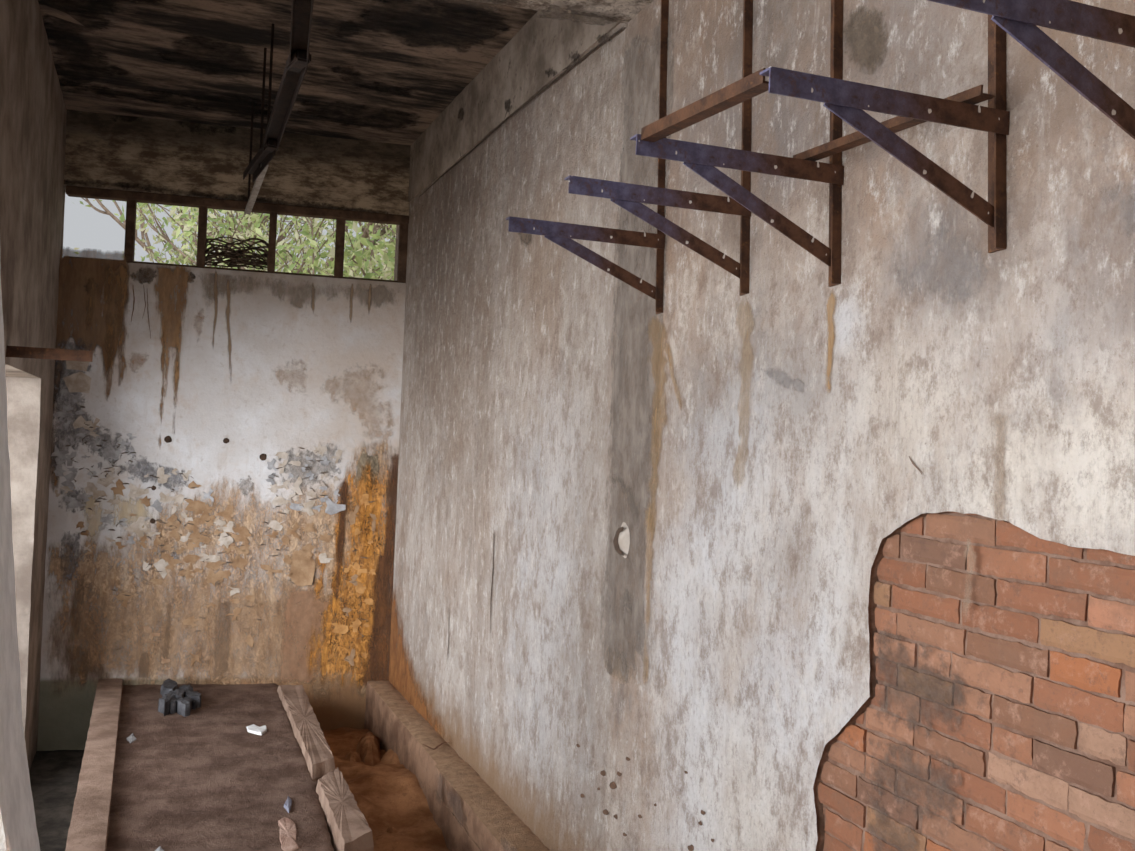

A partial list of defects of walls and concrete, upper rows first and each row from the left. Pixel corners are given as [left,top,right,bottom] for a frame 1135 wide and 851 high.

water stain [620,21,673,188]
water stain [205,272,237,366]
water stain [272,282,392,321]
water stain [619,203,666,235]
water stain [51,339,186,489]
peeling [51,361,379,666]
corrosion [309,455,443,736]
water stain [602,244,665,681]
flaking render [813,511,1135,851]